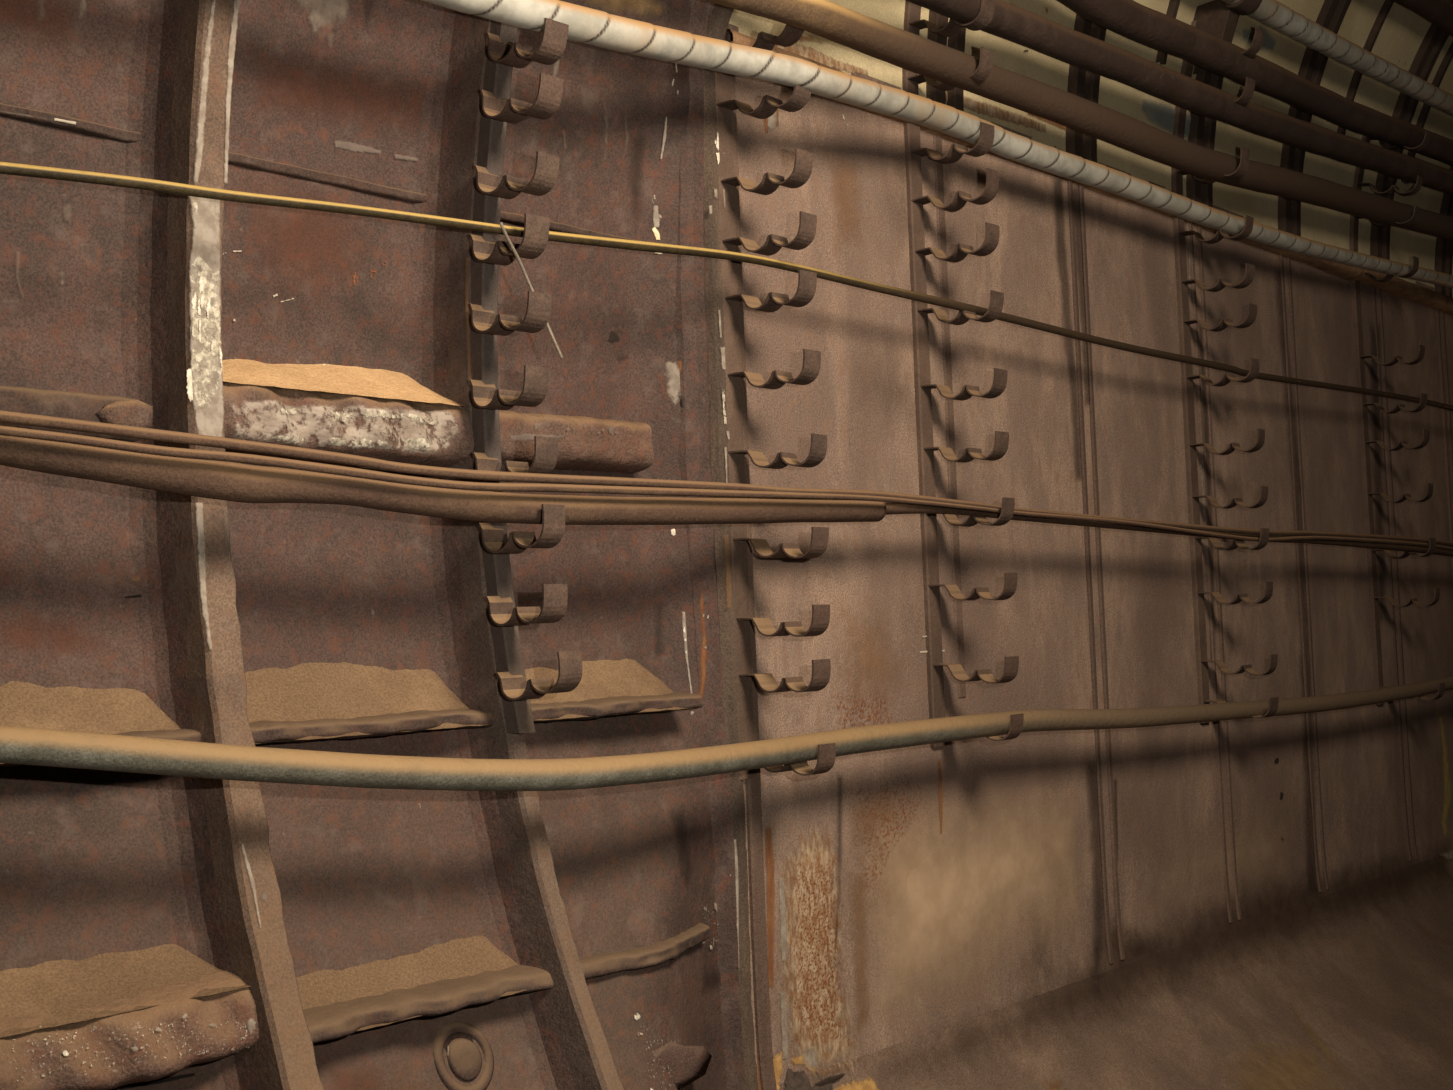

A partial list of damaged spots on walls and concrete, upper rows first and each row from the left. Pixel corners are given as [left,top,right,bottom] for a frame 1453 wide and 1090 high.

water stain [186,0,458,454]
rust [766,829,775,999]